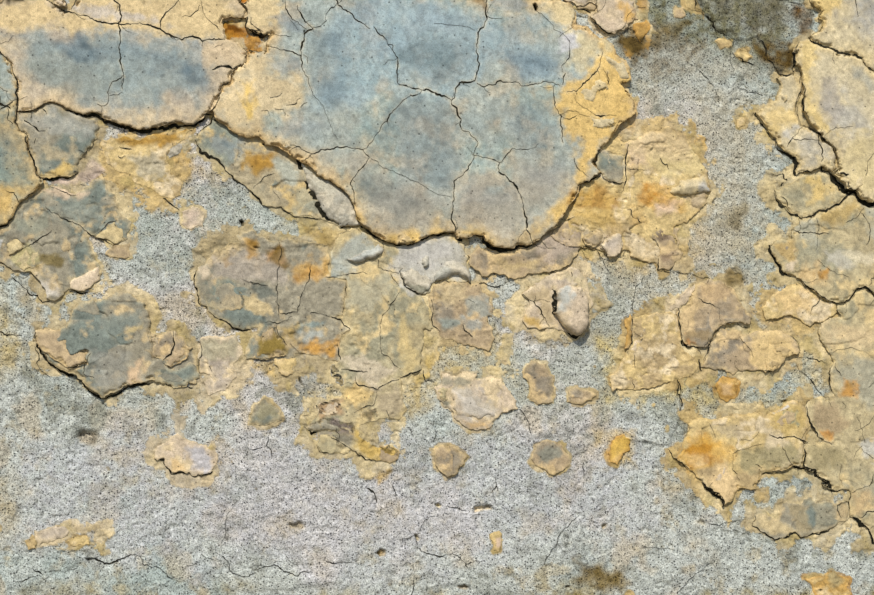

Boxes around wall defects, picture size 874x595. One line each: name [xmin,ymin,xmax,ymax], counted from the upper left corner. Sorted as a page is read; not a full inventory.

crack [0,37,113,303]
crack [48,0,223,112]
crack [197,0,645,248]
spalling [564,0,650,43]
crack [692,0,874,315]
peeling [736,74,837,175]
water stain [846,0,874,43]
crack [245,242,438,419]
peeling [0,102,711,465]
peeling [608,278,837,402]
peeling [154,433,218,476]
crack [732,335,874,544]